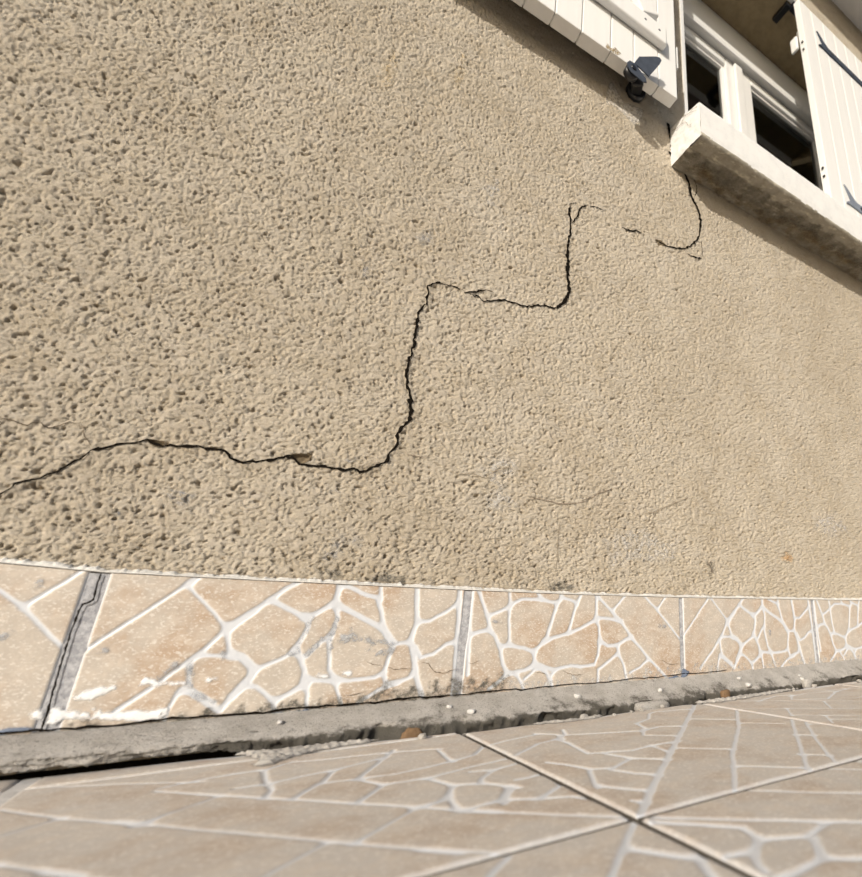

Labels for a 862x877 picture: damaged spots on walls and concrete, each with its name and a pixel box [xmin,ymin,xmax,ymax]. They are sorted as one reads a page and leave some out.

crack [622,174,703,259]
crack [667,107,696,156]
crack [0,203,603,495]
crack [0,488,725,734]